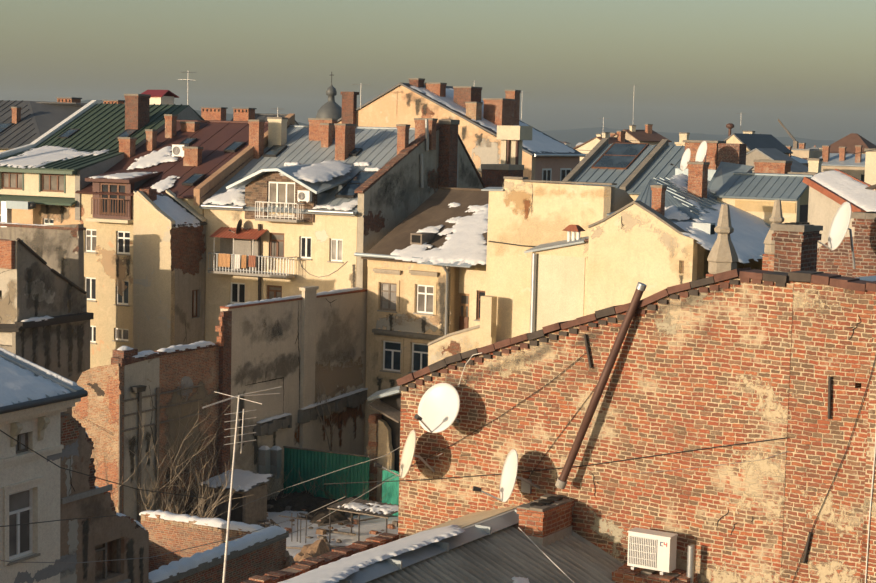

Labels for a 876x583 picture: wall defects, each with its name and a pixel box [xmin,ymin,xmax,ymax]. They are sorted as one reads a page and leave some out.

spalling [170,222,206,276]
spalling [363,210,388,236]
leakage [0,281,17,324]
leakage [21,205,84,376]
spalling [60,369,148,531]
corrosion [320,404,364,451]